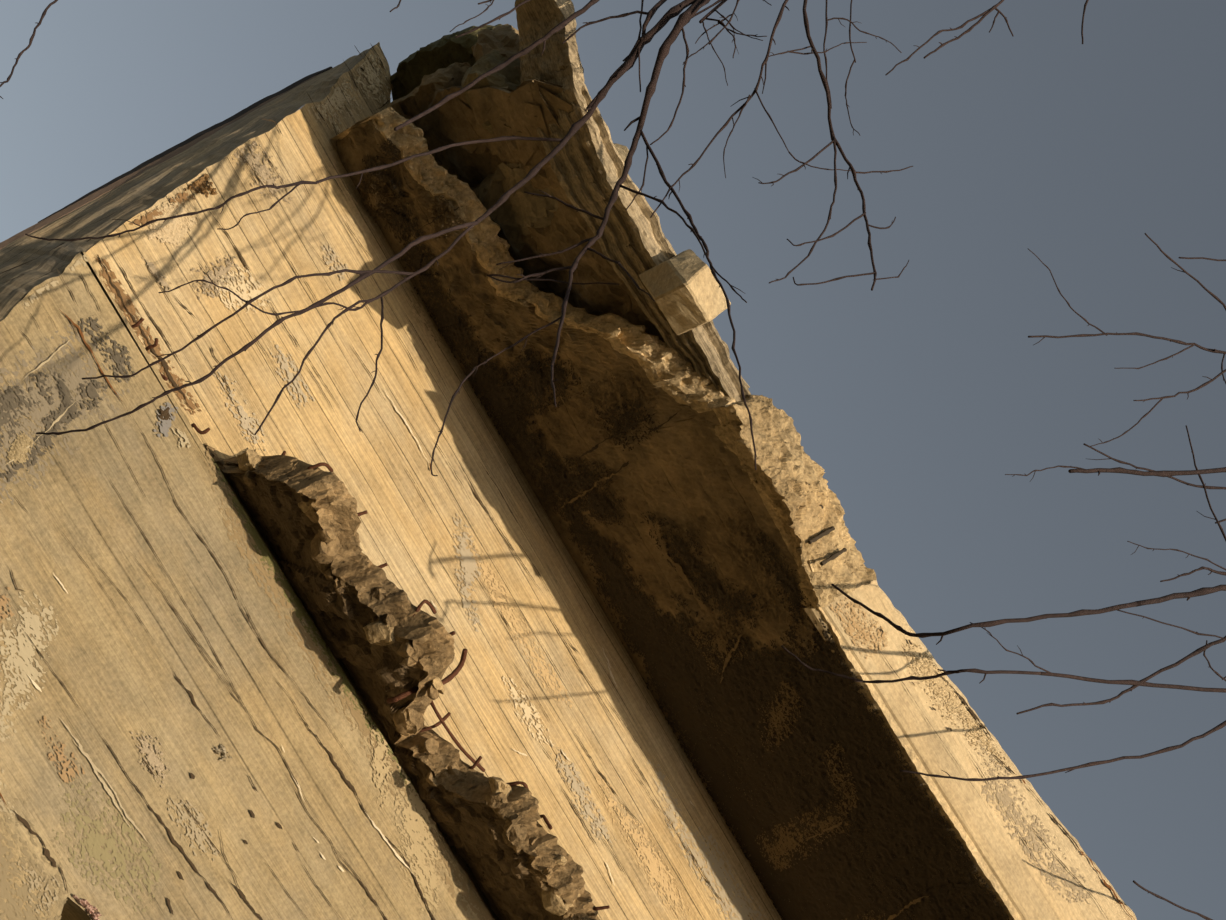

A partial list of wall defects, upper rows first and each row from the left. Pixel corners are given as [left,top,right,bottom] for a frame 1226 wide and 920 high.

corrosion [59,309,122,401]
corrosion [94,254,203,415]
water stain [0,315,135,505]
spalling [307,462,333,472]
spalling [713,395,877,609]
spalling [413,599,437,617]
corrosion [461,529,573,709]
spalling [441,648,468,685]
spalling [418,700,485,772]
spalling [502,676,570,761]
spalling [366,813,415,876]
corrosion [596,774,697,920]